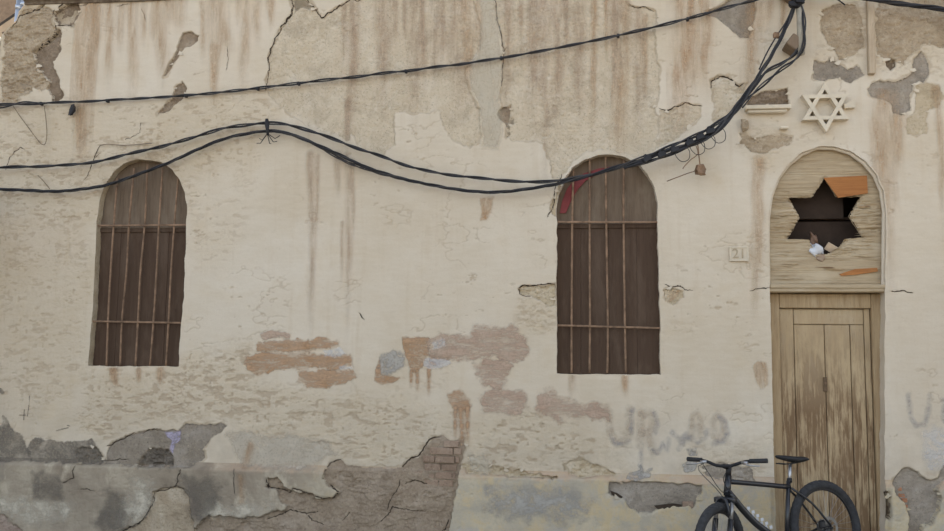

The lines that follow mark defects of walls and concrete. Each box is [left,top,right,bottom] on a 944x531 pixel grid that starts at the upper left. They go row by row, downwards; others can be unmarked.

flaking render [0,3,81,107]
flaking render [158,82,187,114]
flaking render [164,32,199,76]
crack [265,0,360,90]
peeling [266,0,481,154]
crack [495,1,507,86]
peeling [495,0,701,216]
flaking render [707,0,756,38]
flaking render [813,0,944,135]
flaking render [0,423,227,471]
flaking render [125,325,755,531]
flaking render [884,466,944,531]